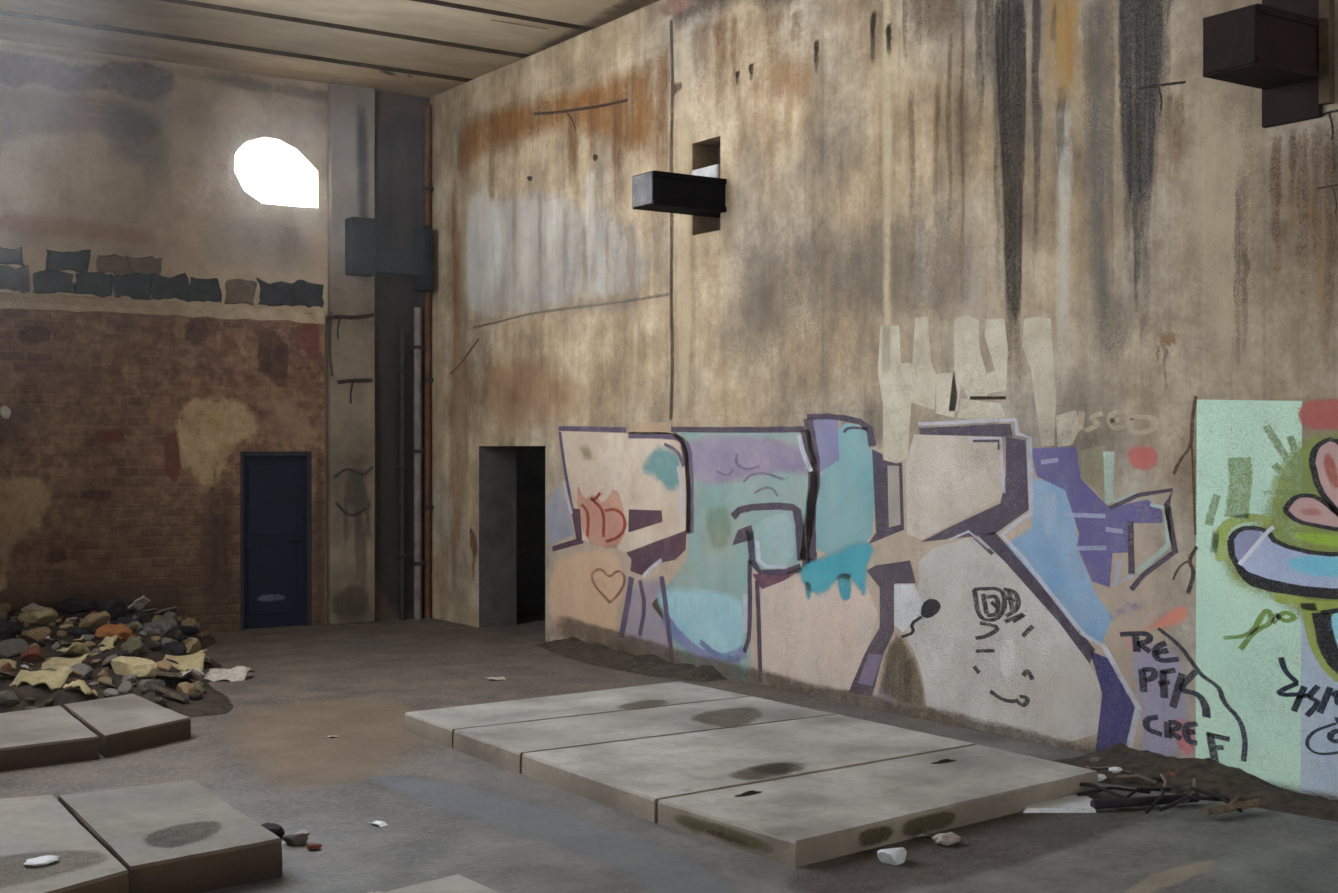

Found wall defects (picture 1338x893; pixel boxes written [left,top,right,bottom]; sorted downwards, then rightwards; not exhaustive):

corrosion [449,44,671,593]
water stain [690,0,1263,407]